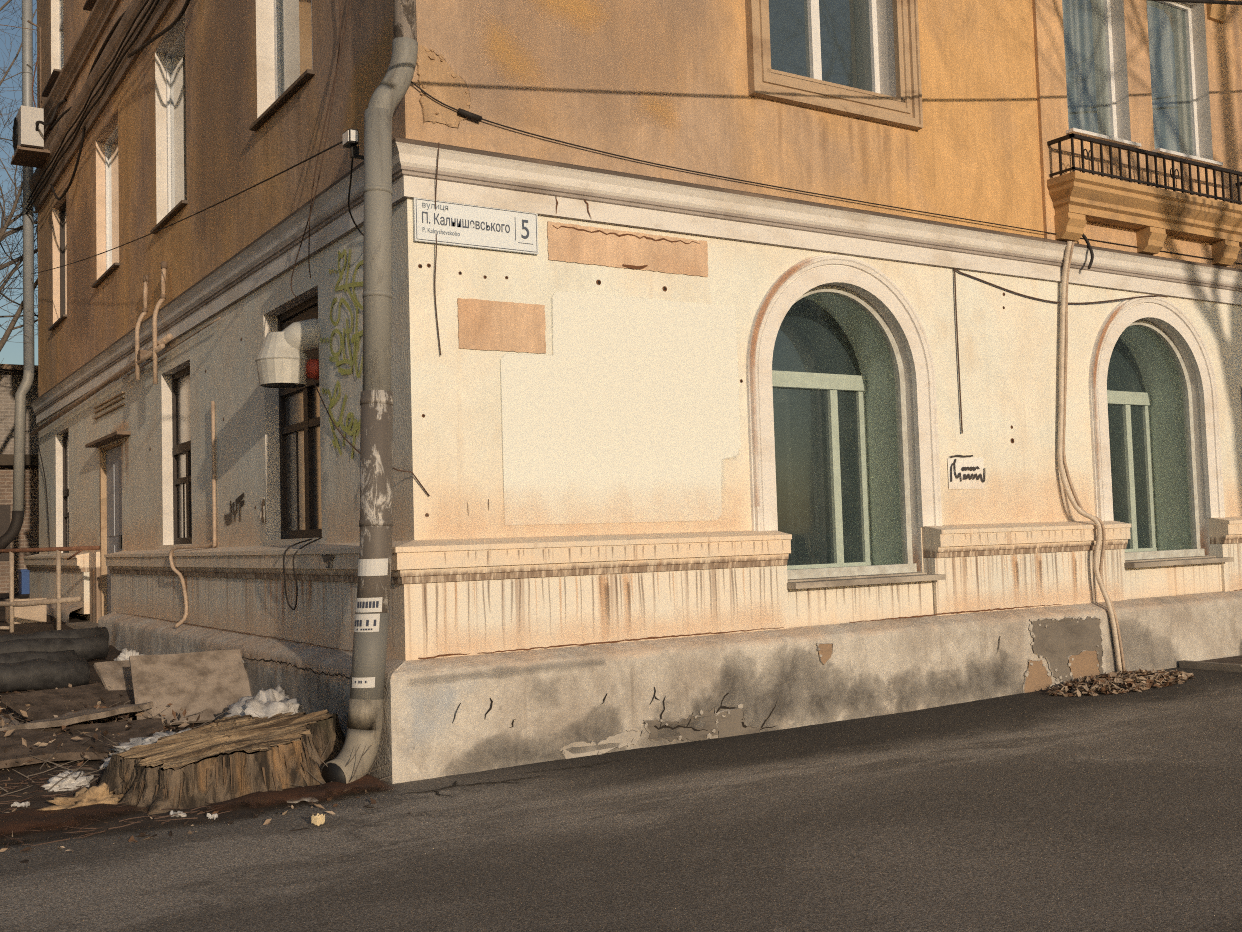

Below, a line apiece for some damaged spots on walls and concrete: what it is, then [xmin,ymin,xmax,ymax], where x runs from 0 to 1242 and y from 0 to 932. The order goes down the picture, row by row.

peeling [416,45,470,128]
crack [452,698,516,728]
damp [433,661,604,679]
crack [643,687,777,731]
damp [649,656,881,746]
spalling [816,643,833,665]
damp [898,662,1023,713]
spalling [1023,616,1104,693]
damp [460,715,625,773]
crack [409,758,630,796]